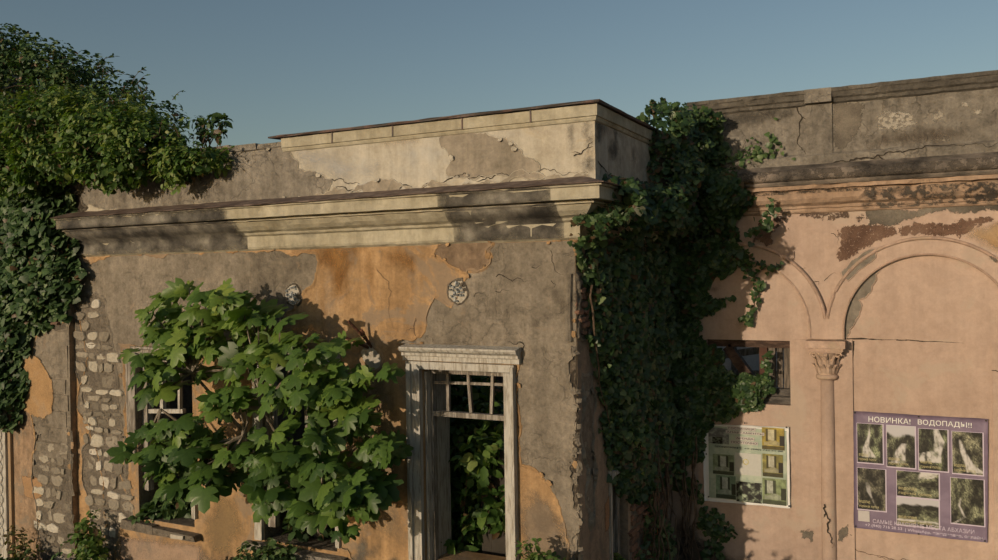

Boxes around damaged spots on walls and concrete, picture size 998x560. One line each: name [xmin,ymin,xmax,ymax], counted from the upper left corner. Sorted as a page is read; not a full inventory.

peeling [65,132,591,214]
water stain [439,186,563,242]
crack [796,107,806,154]
crack [833,143,997,163]
peeling [800,205,998,340]
peeling [21,249,320,560]
peeling [397,239,592,560]